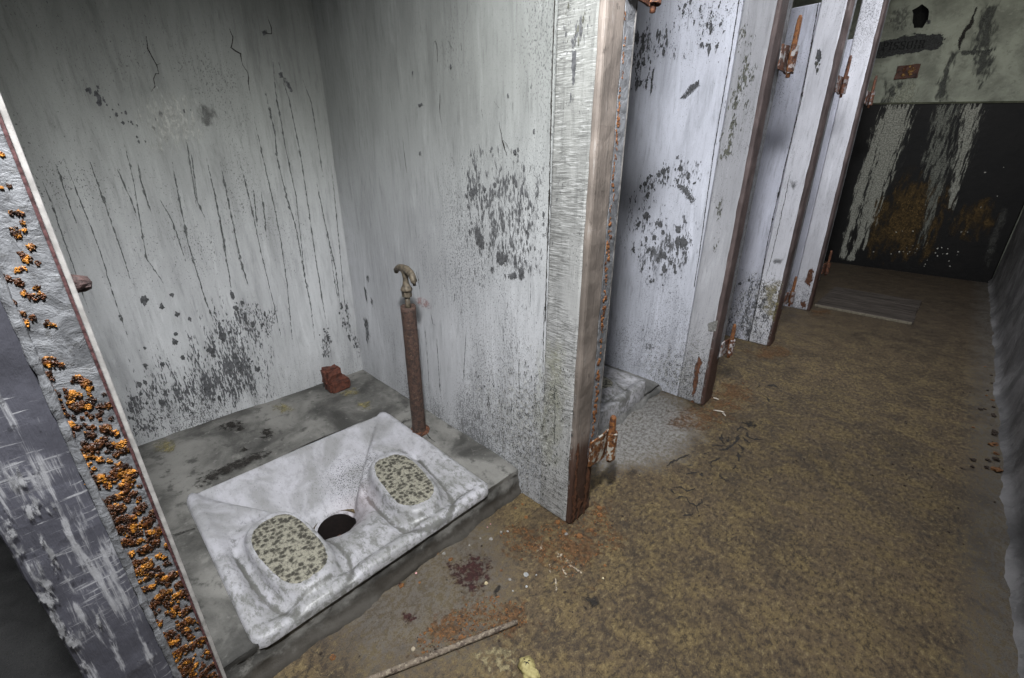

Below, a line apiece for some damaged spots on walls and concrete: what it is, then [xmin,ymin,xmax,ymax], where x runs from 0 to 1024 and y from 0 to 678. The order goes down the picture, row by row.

crack [146,36,159,90]
crack [229,28,250,91]
spalling [912,4,931,28]
water stain [974,6,998,50]
corrosion [3,209,57,328]
corrosion [591,37,626,437]
corrosion [670,356,752,431]
corrosion [41,356,220,678]